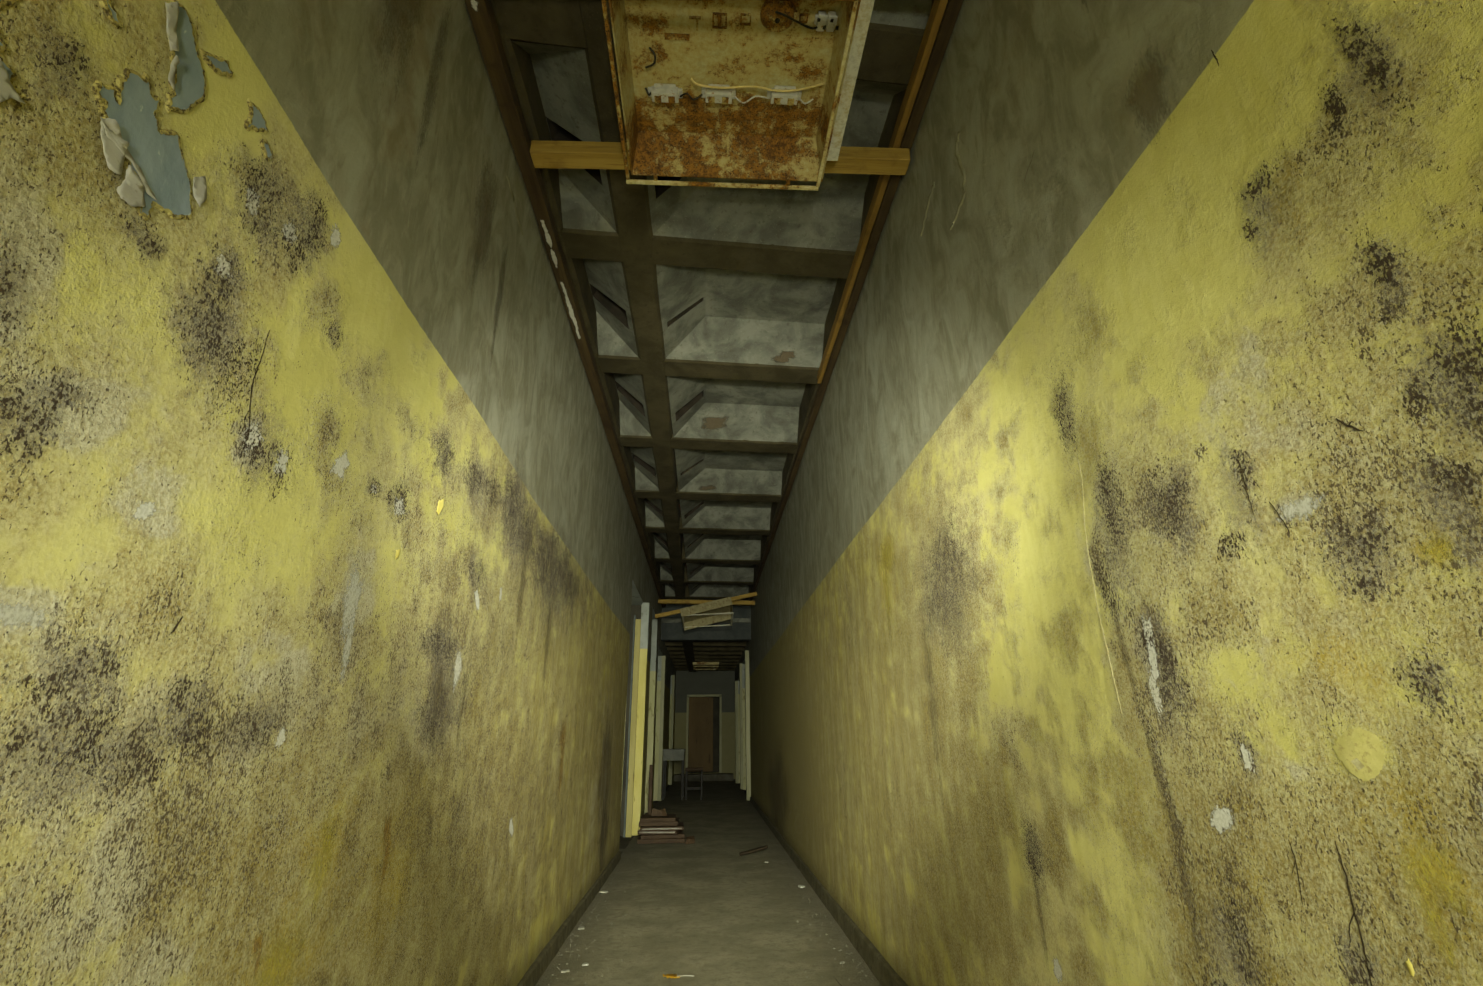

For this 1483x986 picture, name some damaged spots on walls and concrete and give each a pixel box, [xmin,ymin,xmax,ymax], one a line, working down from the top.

peeling [0,31,26,109]
peeling [91,0,233,221]
damp [1241,160,1280,201]
damp [1318,2,1409,138]
damp [114,130,340,504]
damp [1361,228,1405,332]
damp [1396,299,1483,541]
damp [918,500,976,665]
damp [1054,366,1198,741]
damp [0,639,292,810]